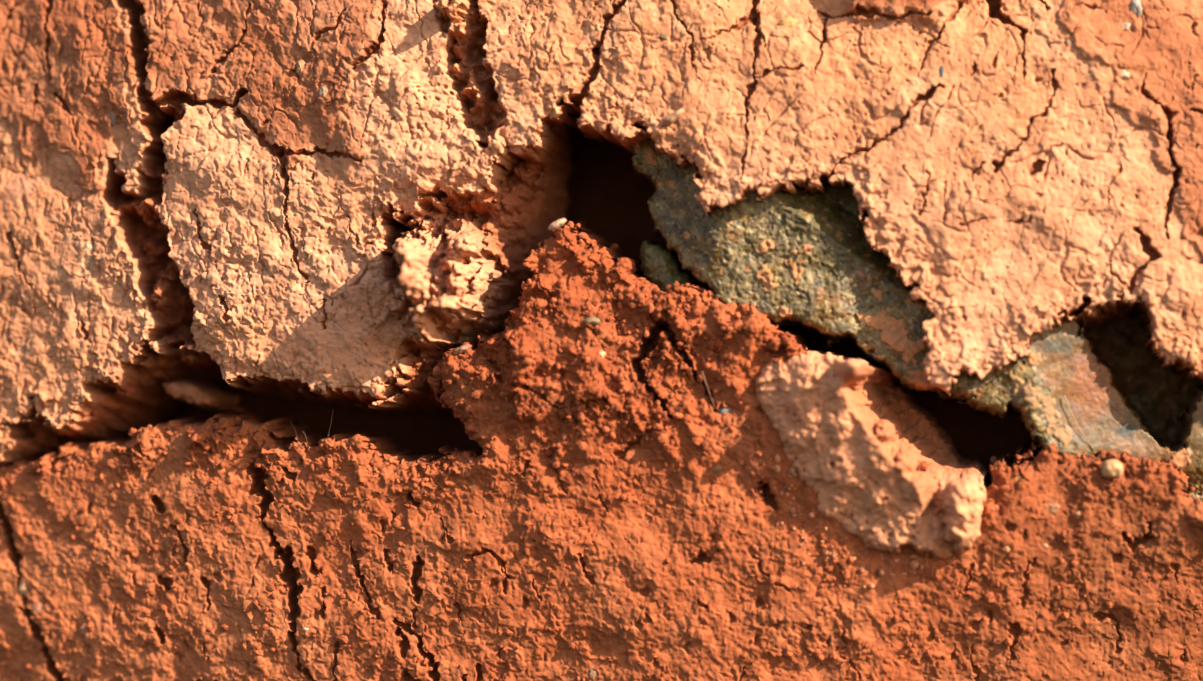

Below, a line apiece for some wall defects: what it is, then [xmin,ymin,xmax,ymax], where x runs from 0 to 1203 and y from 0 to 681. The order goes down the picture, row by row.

crack [0,0,377,331]
crack [562,0,627,126]
spalling [0,0,1203,484]
crack [667,0,1102,228]
crack [78,319,89,341]
crack [0,503,70,681]
crack [245,458,341,681]
crack [349,517,543,681]
crack [576,552,597,586]
hole [755,480,781,512]
spalling [986,440,1203,505]